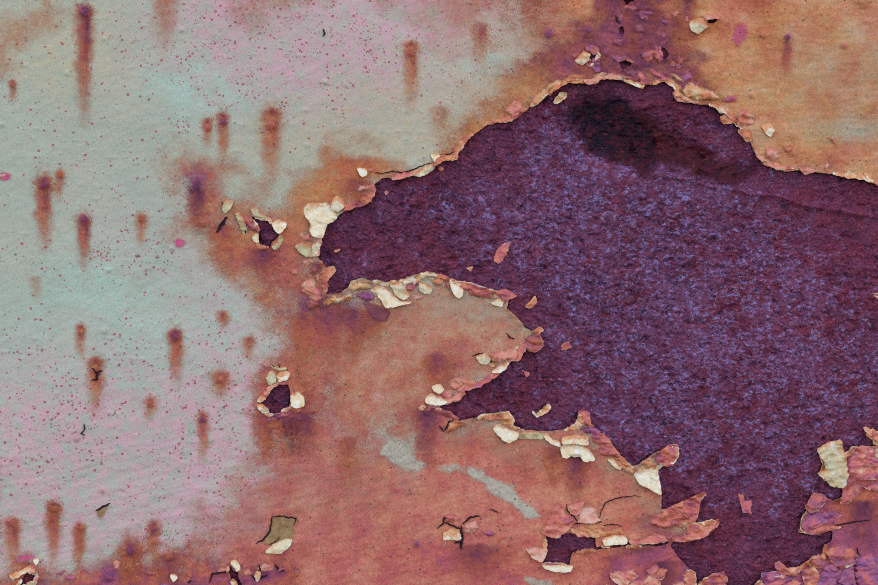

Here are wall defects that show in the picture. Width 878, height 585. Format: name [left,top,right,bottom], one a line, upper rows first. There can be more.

peeling [672,10,720,34]
rust [76,4,93,102]
rust [442,0,878,184]
rust [204,113,228,151]
rust [262,107,280,162]
peeling [222,200,287,250]
peeling [292,68,878,585]
peeling [257,363,306,423]
rust [0,146,690,585]
peeling [9,558,39,585]
peeling [203,538,300,585]
rust [792,479,878,585]